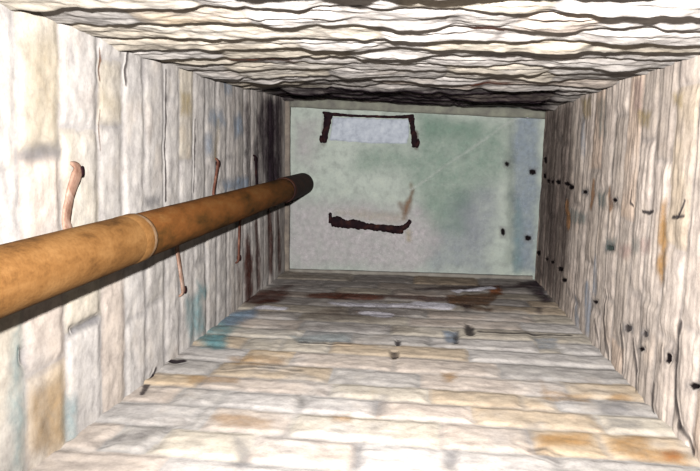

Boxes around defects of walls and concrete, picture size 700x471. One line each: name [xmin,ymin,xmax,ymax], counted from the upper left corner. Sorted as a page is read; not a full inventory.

leakage [255,87,554,184]
rust [447,286,501,311]